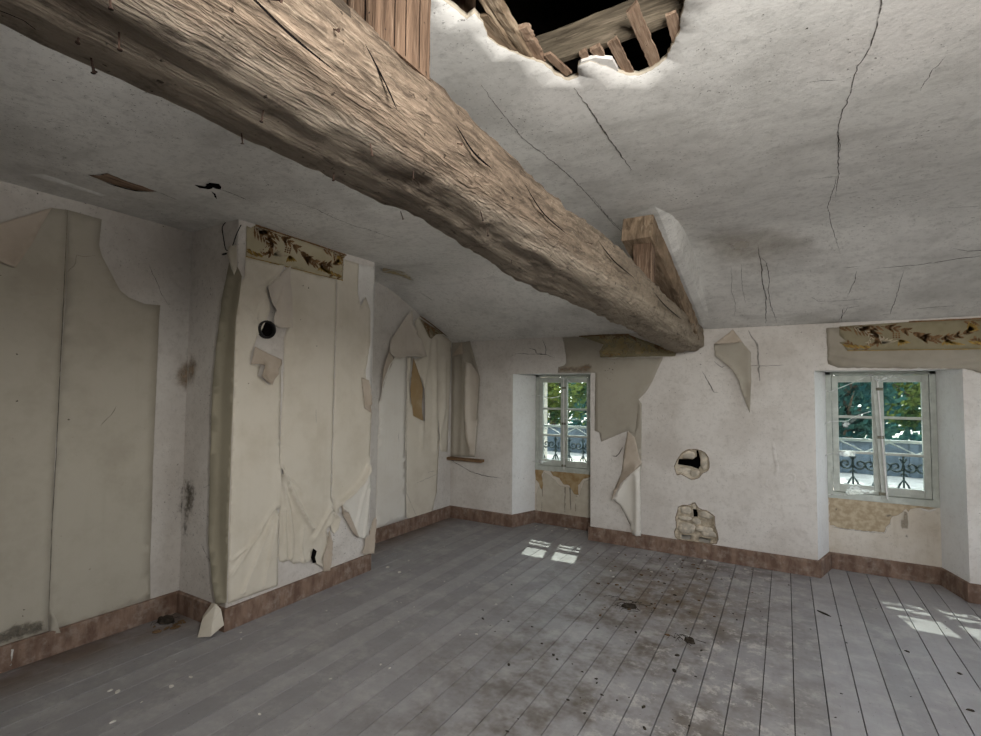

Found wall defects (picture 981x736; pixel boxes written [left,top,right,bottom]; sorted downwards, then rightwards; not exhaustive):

crack [814,0,981,320]
crack [731,248,777,323]
hole [674,449,710,480]
flaking render [674,502,719,544]